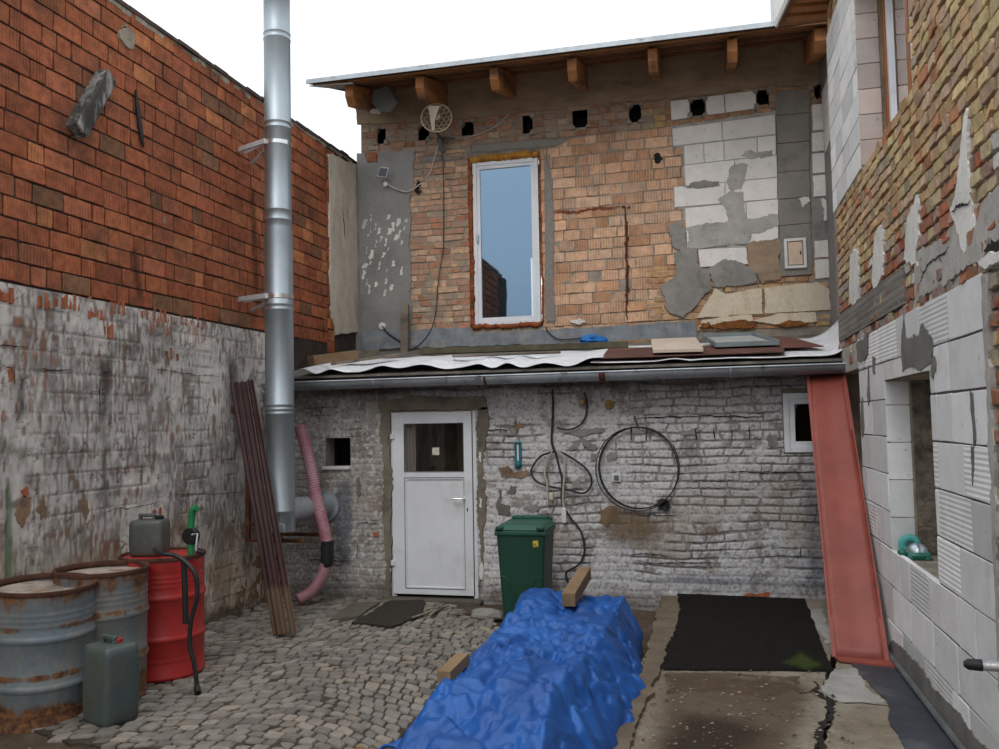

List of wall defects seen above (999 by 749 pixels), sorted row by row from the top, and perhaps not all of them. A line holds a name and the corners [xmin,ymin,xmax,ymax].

crack [554,206,631,320]
spalling [983,240,999,252]
peeling [0,288,15,304]
peeling [36,293,125,339]
crack [799,681,888,749]